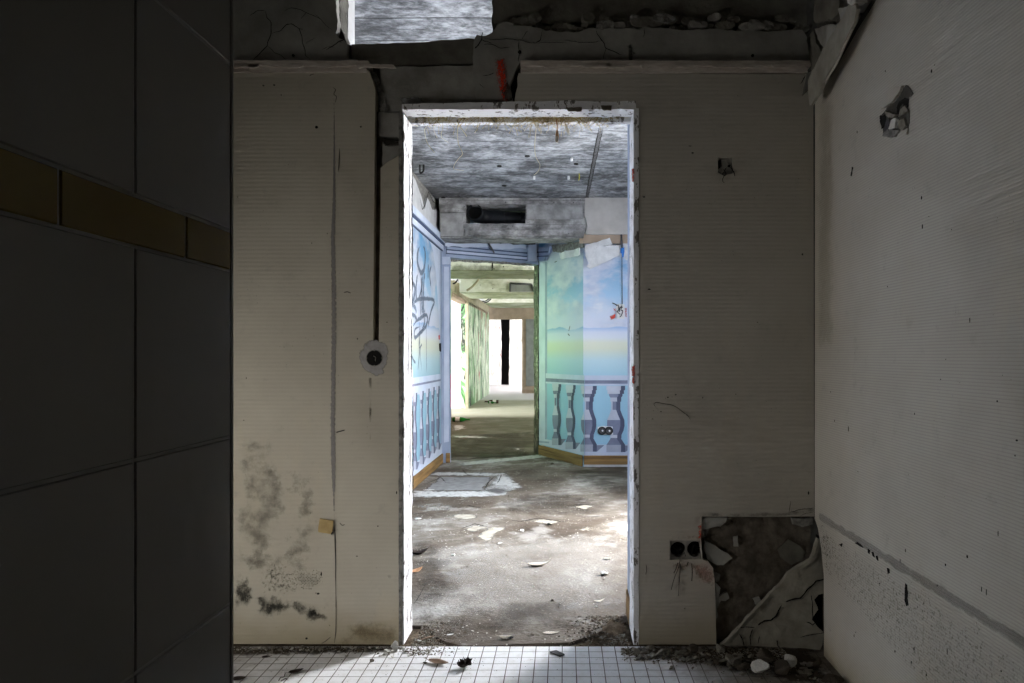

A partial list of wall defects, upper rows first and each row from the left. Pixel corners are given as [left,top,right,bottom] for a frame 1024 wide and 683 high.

peeling [802,0,876,106]
hole [880,85,914,138]
mould [236,584,325,619]
spalling [701,517,824,650]